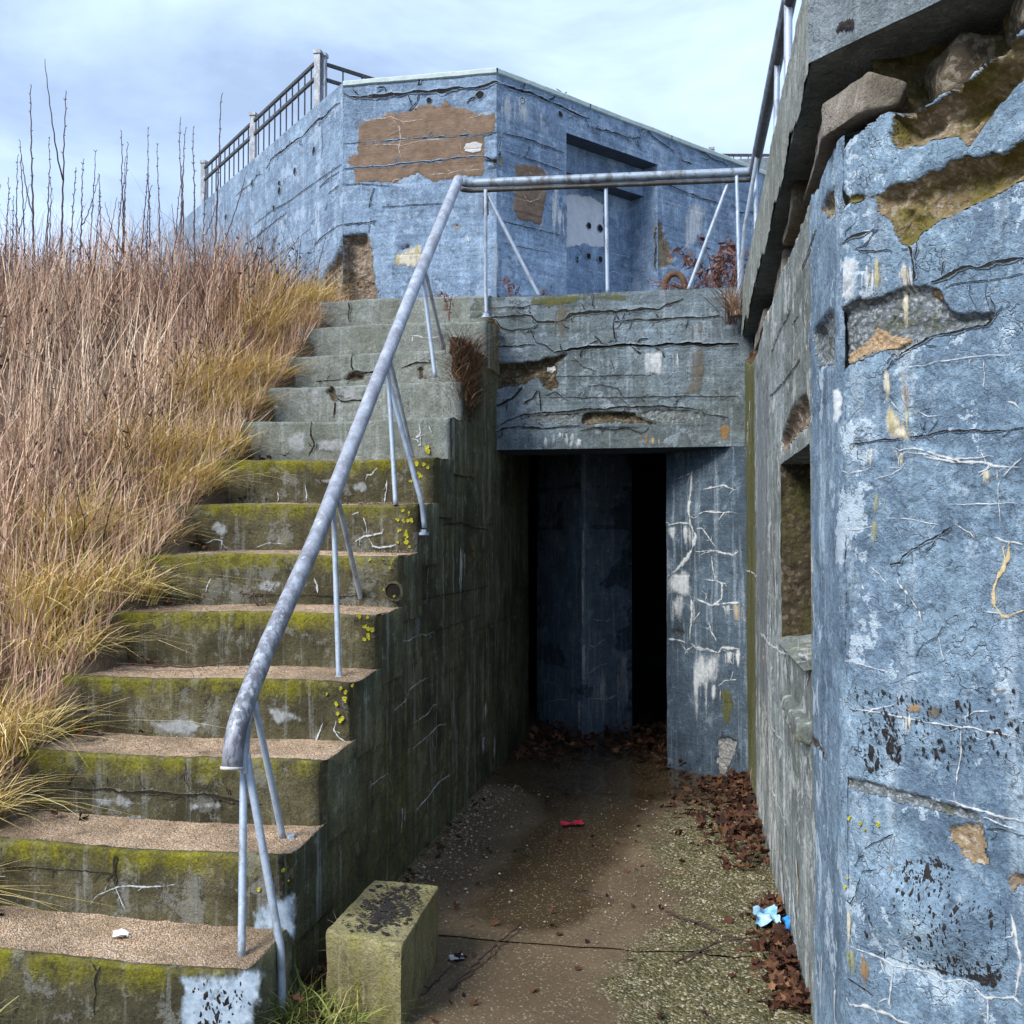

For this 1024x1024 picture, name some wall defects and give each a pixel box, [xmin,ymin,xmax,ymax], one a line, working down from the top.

peeling [347,101,502,183]
spalling [810,26,1024,246]
spalling [498,353,567,391]
crack [489,295,738,438]
spalling [813,285,994,370]
crack [666,472,757,685]
crack [842,401,1023,676]
crack [847,833,893,905]
spalling [848,777,989,865]
crack [847,704,1024,840]
peeling [182,971,260,1024]
crack [847,914,1023,1024]